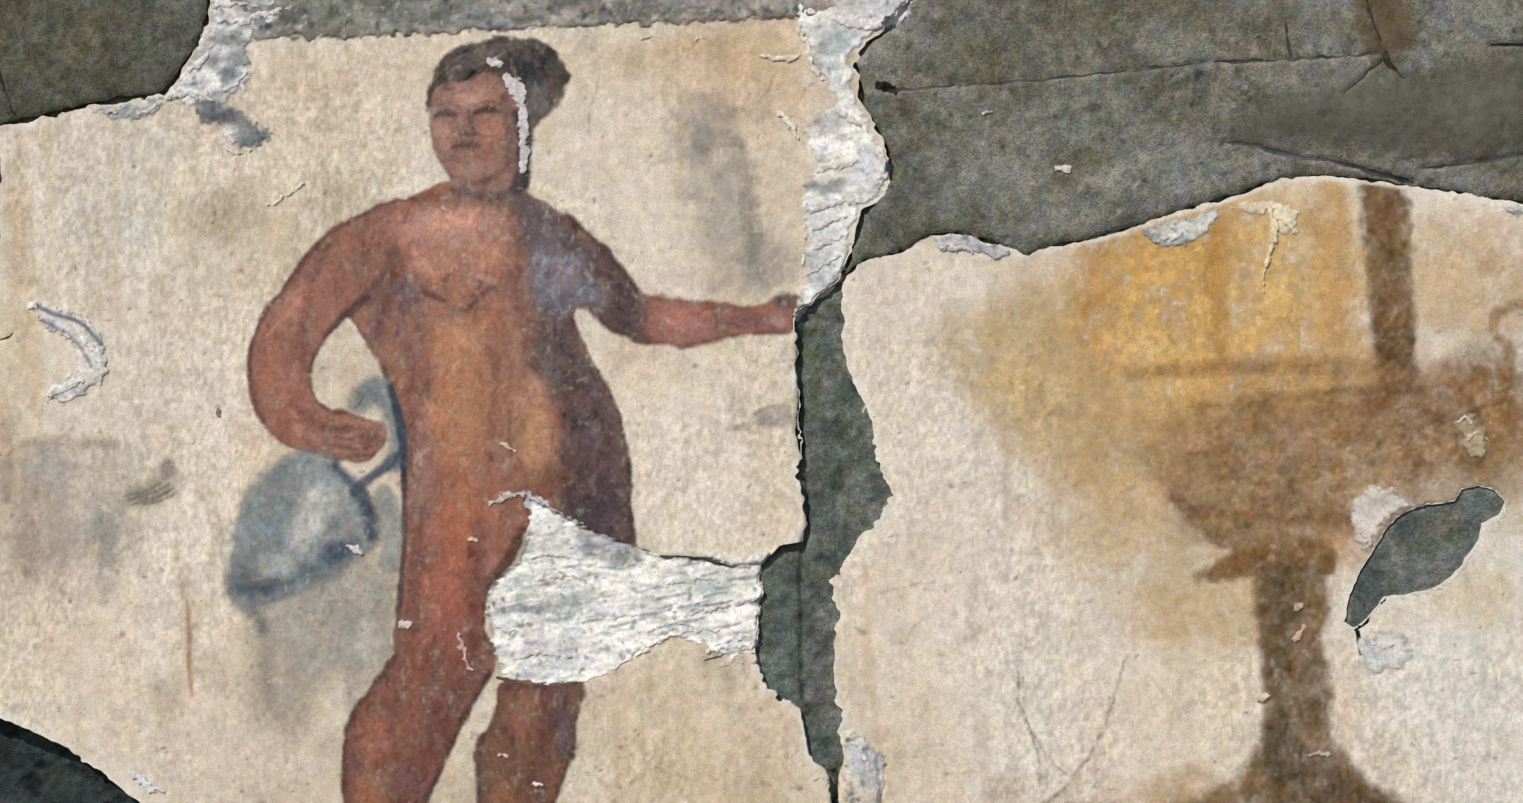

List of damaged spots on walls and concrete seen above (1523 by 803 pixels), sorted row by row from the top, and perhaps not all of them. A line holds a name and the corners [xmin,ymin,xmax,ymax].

crack [882,0,1405,92]
crack [1225,140,1523,183]
peeling [935,233,1010,259]
peeling [26,300,108,402]
flaking render [93,0,913,803]
peeling [1456,414,1488,458]
flaking render [1344,479,1511,627]